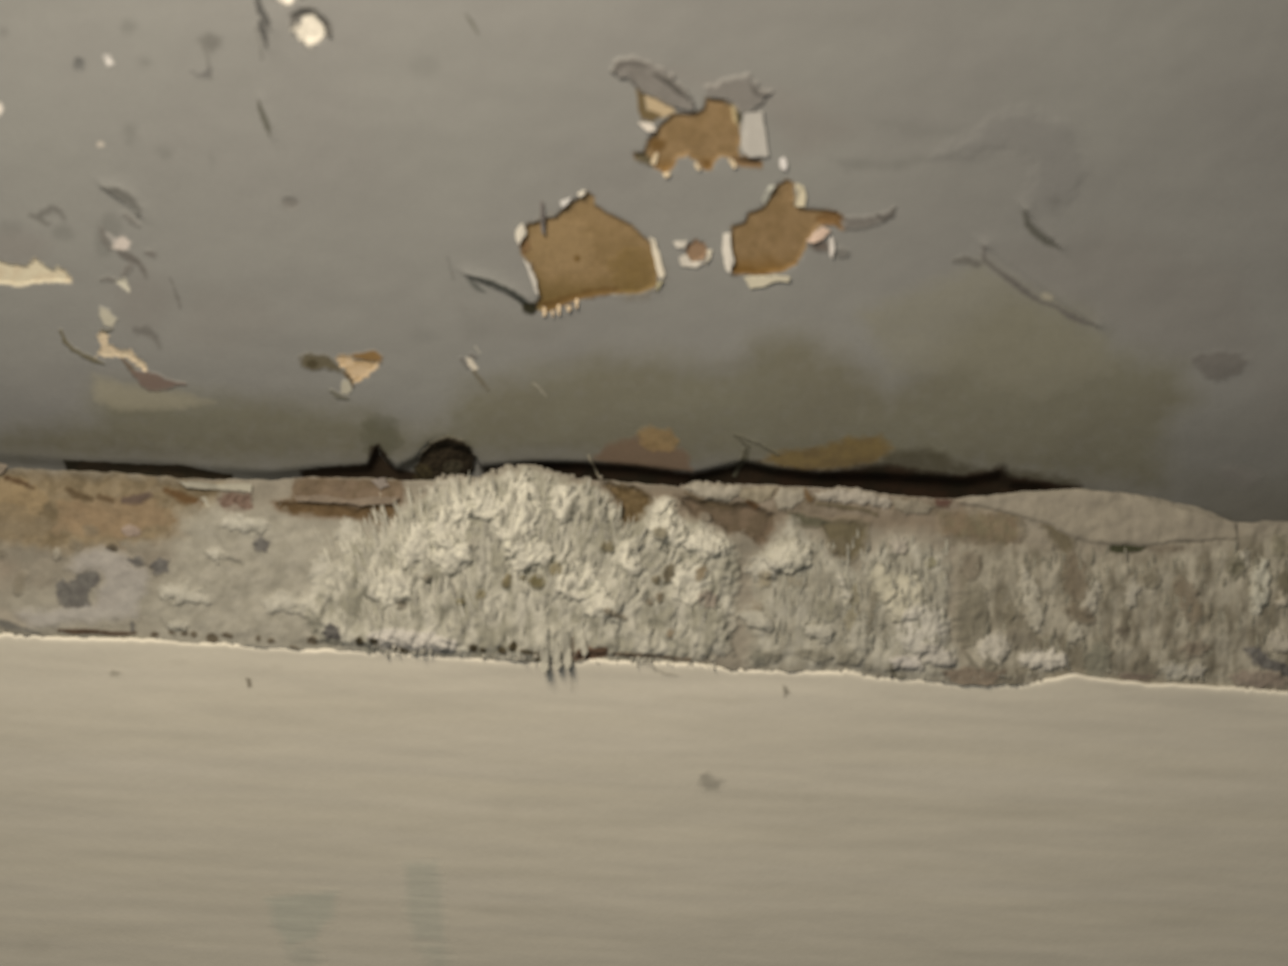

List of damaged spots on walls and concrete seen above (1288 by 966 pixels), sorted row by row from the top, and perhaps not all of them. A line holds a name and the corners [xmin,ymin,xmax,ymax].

spalling [271,0,335,52]
peeling [515,54,898,317]
spalling [0,255,75,289]
spalling [296,348,385,401]
water stain [0,248,1288,694]
spalling [0,463,408,599]
peeling [674,480,1030,549]
spalling [148,630,234,643]
spalling [354,636,410,654]
spalling [468,640,541,661]
water stain [261,887,342,966]
water stain [398,856,459,966]